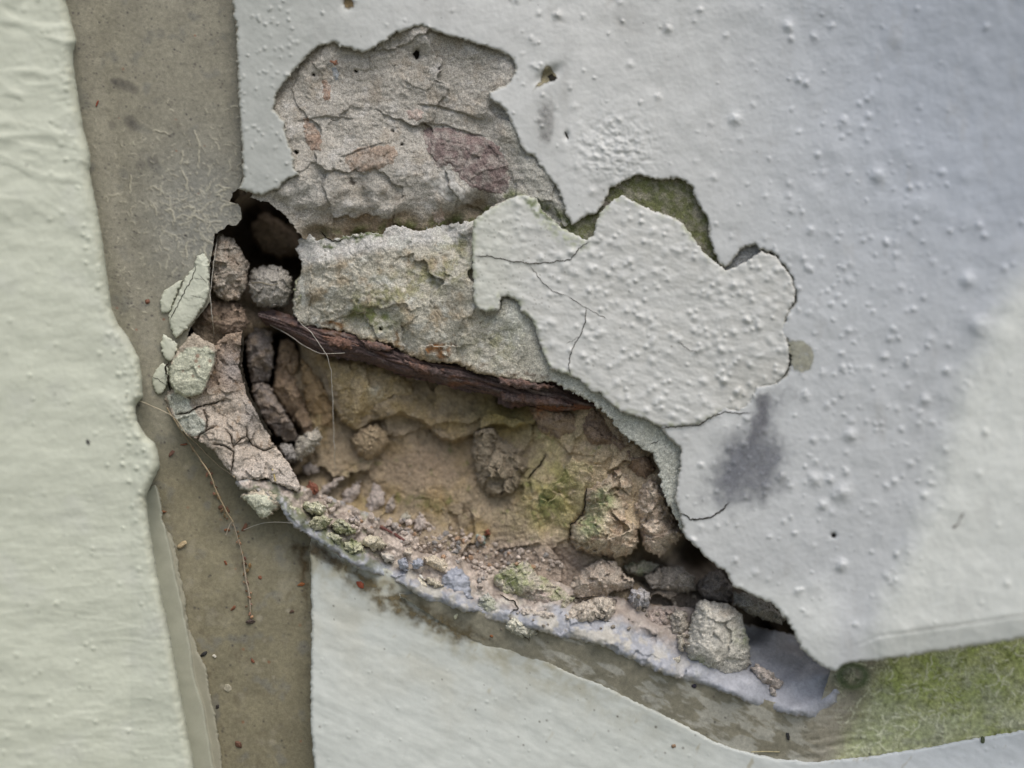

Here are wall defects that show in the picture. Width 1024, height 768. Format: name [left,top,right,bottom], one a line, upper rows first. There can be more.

crack [176,334,280,471]
rust [258,309,602,412]
spalling [152,25,814,635]
crack [479,243,606,375]
damp [718,398,780,499]